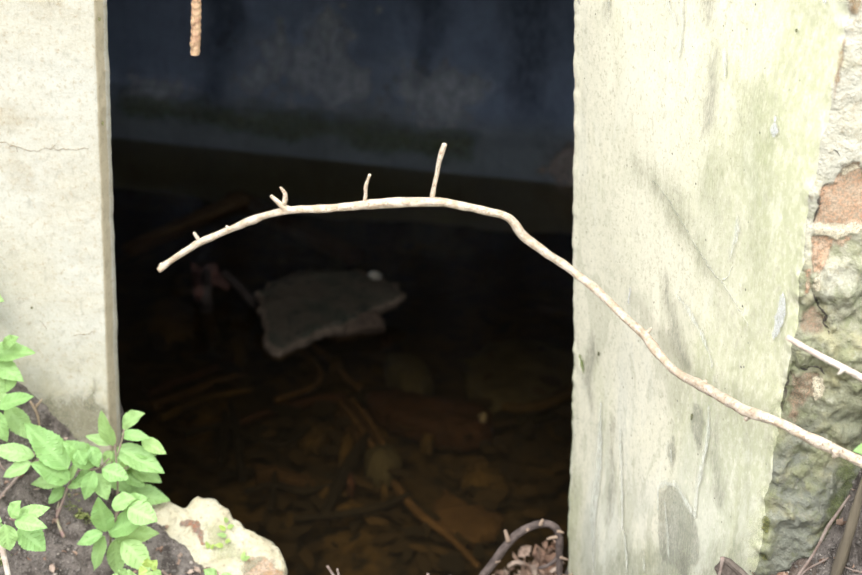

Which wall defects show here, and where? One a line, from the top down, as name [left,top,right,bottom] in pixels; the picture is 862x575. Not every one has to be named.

crack [0,142,89,152]
spalling [805,162,862,293]